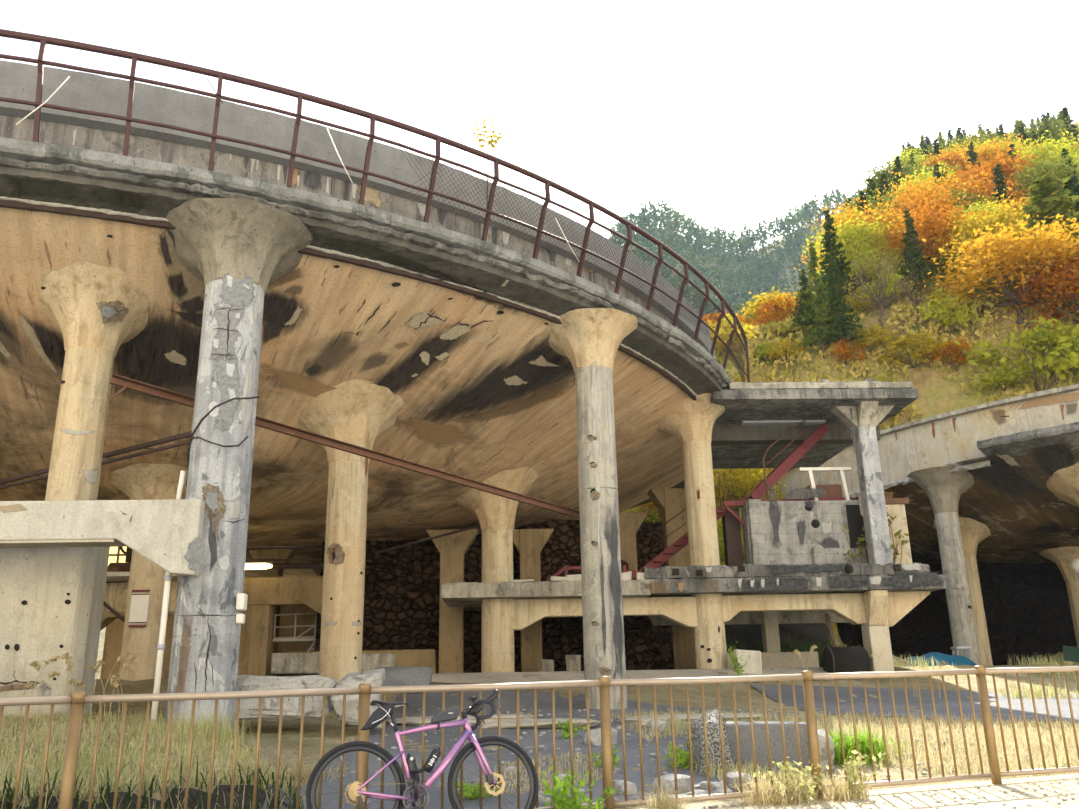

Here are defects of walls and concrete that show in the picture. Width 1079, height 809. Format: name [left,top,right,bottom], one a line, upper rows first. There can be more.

spalling [96,300,128,325]
leakage [113,311,203,404]
peeling [158,229,255,431]
leakage [374,332,470,394]
spalling [404,311,504,340]
leakage [422,338,576,422]
leakage [766,484,780,544]
leakage [790,487,840,549]
spalling [326,543,345,565]
crack [0,671,48,692]